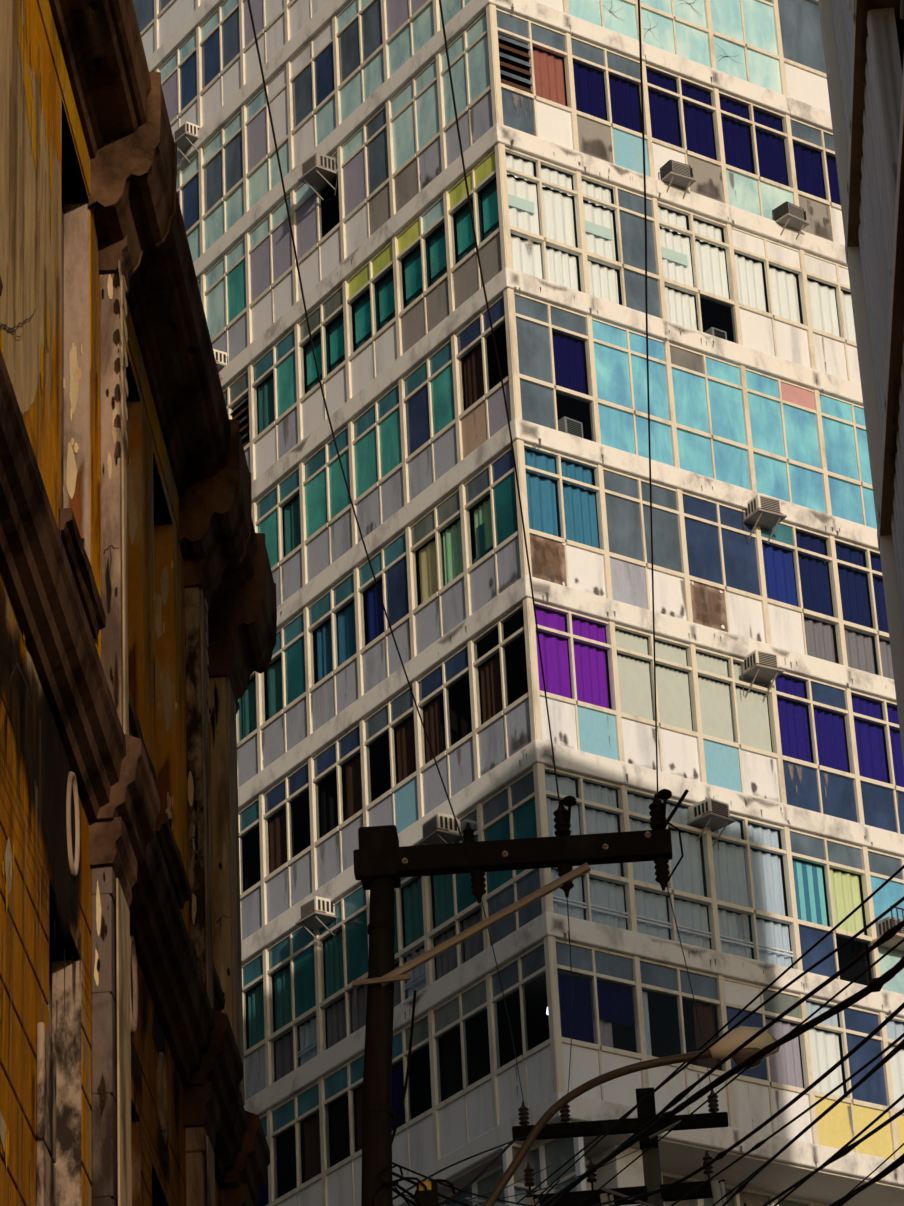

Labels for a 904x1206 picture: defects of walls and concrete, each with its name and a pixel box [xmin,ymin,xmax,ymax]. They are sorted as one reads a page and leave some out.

peeling [0,0,52,414]
crack [0,309,36,338]
spalling [106,563,117,612]
spalling [110,658,119,709]